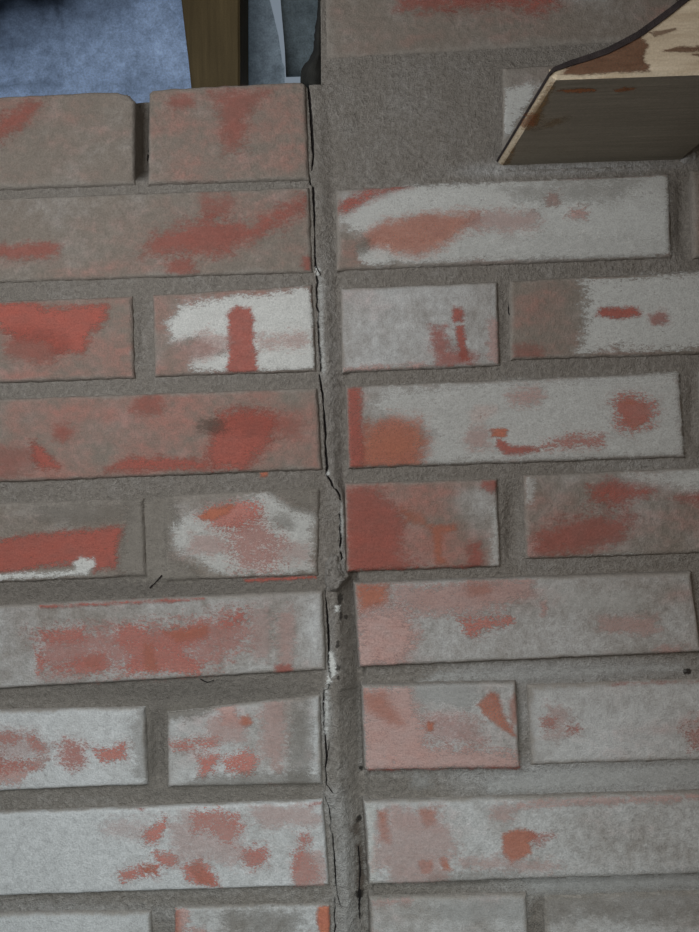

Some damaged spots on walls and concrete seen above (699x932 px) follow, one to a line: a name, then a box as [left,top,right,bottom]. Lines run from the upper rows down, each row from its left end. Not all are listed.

crack [307,88,343,560]
crack [323,589,361,932]